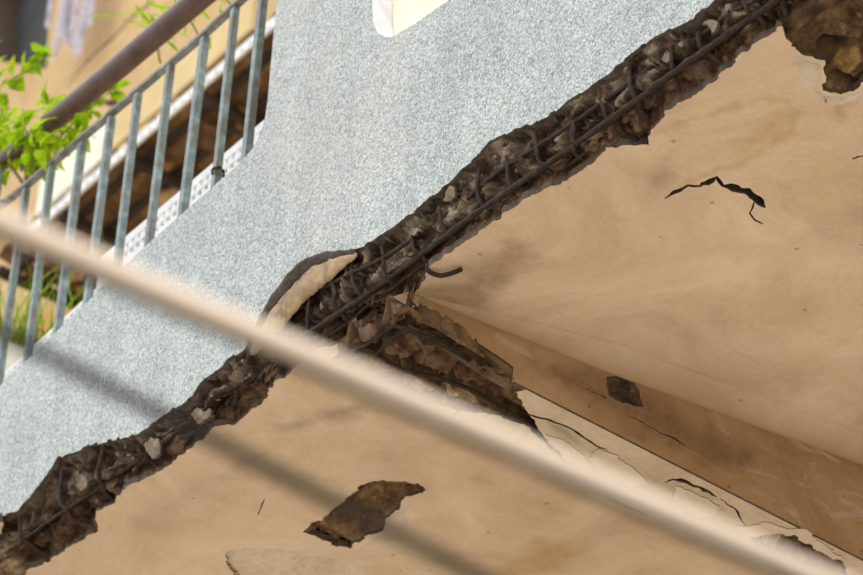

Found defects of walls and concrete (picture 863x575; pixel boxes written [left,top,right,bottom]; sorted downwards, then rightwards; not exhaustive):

spalling [202,122,217,152]
spalling [158,188,180,208]
spalling [283,0,863,427]
crack [671,176,764,213]
spalling [177,352,290,429]
crack [520,408,554,448]
peeling [545,434,646,485]
spalling [0,423,194,575]
spalling [346,480,424,528]
peeling [226,510,391,575]
spalling [735,522,848,575]